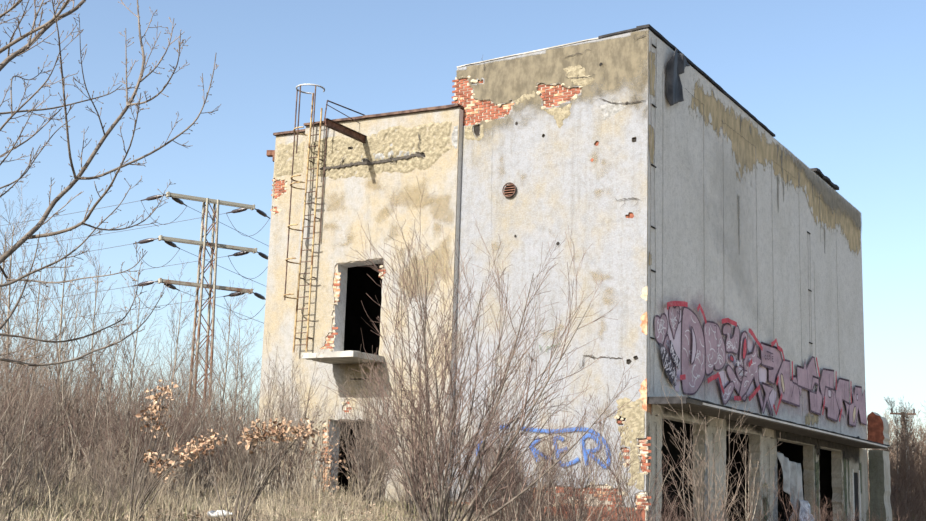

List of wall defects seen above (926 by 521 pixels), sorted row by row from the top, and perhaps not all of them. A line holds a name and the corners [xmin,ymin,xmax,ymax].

spalling [270,65,594,215]
peeling [688,80,861,260]
spalling [320,264,341,351]
spalling [529,378,653,519]